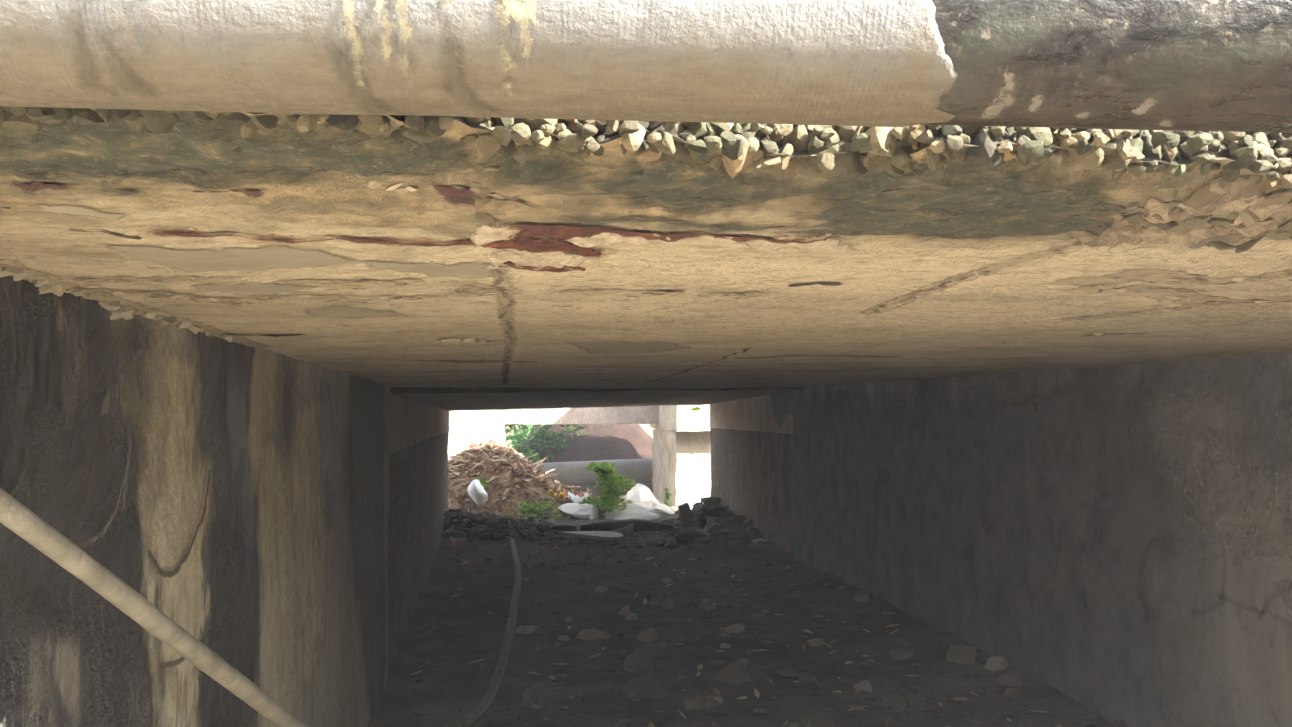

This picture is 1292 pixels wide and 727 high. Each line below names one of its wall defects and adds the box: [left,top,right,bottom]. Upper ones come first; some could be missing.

spalling [0,72,1292,254]
crack [70,227,517,384]
damp [107,245,493,295]
damp [306,305,404,318]
spalling [356,174,859,273]
crack [861,238,1091,314]
crack [647,348,749,383]
damp [0,276,385,727]